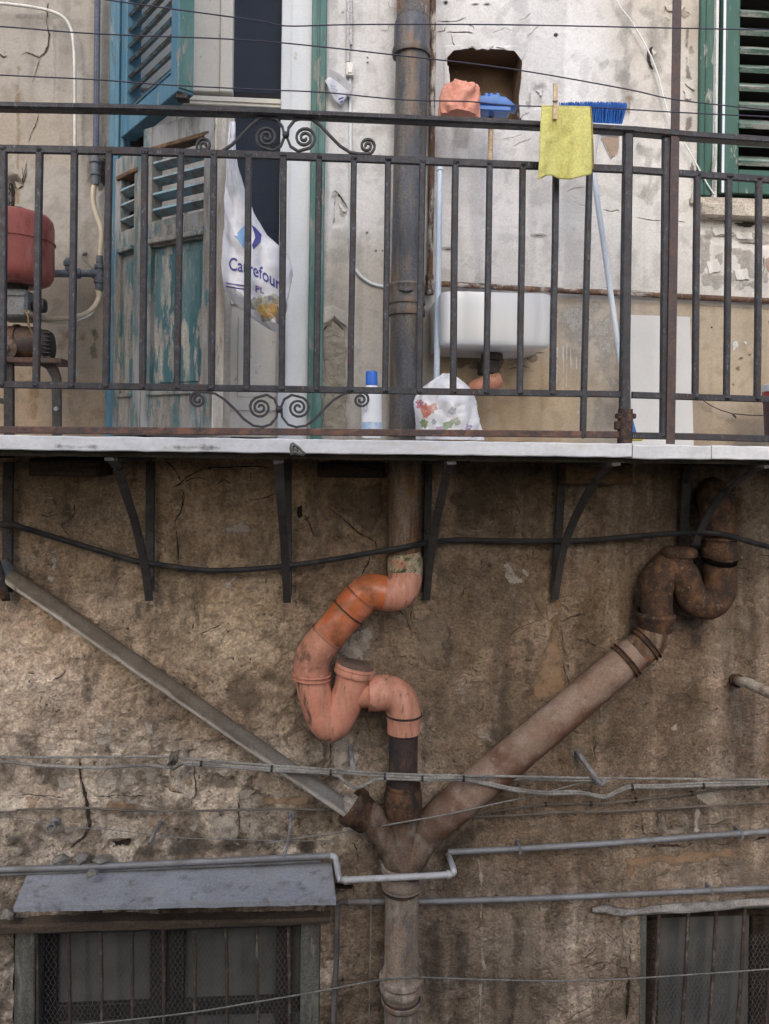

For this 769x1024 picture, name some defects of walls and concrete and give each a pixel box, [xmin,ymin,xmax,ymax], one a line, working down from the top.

crack [0,2,50,83]
flaking render [700,221,769,289]
crack [163,461,273,565]
crack [10,758,148,849]
crack [233,800,241,833]